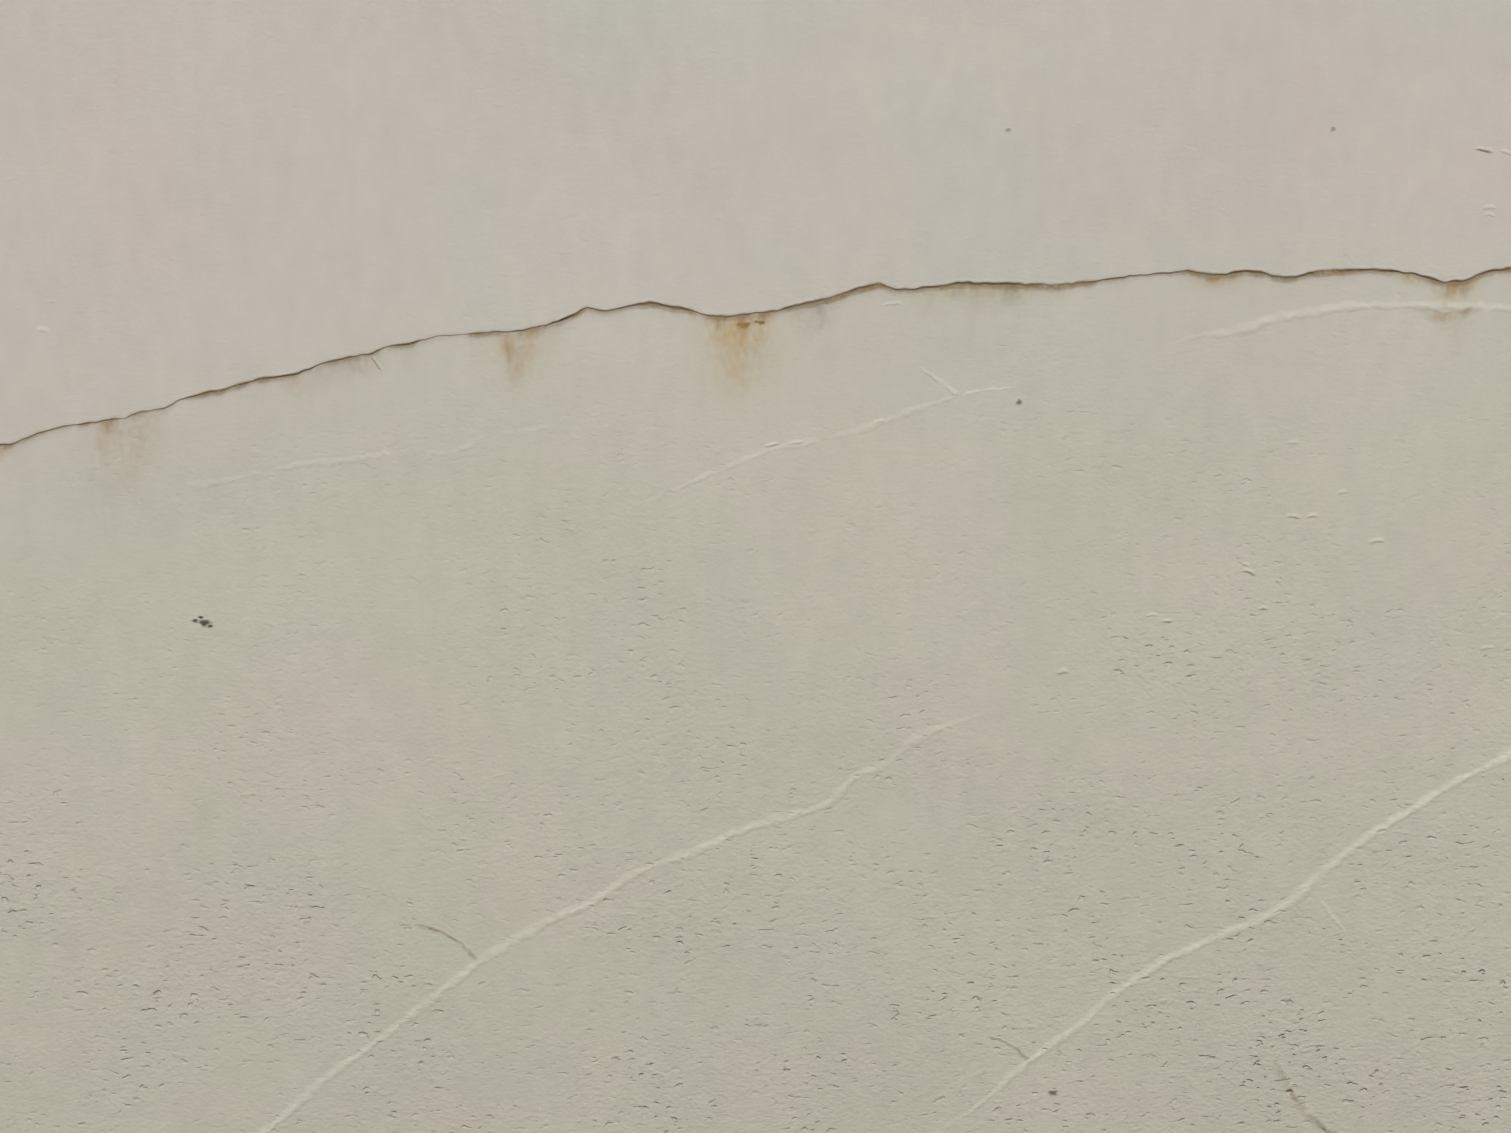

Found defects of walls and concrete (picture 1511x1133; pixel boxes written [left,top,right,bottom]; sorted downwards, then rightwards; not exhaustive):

crack [0,264,1511,449]
crack [255,702,1010,1133]
crack [933,746,1511,1133]